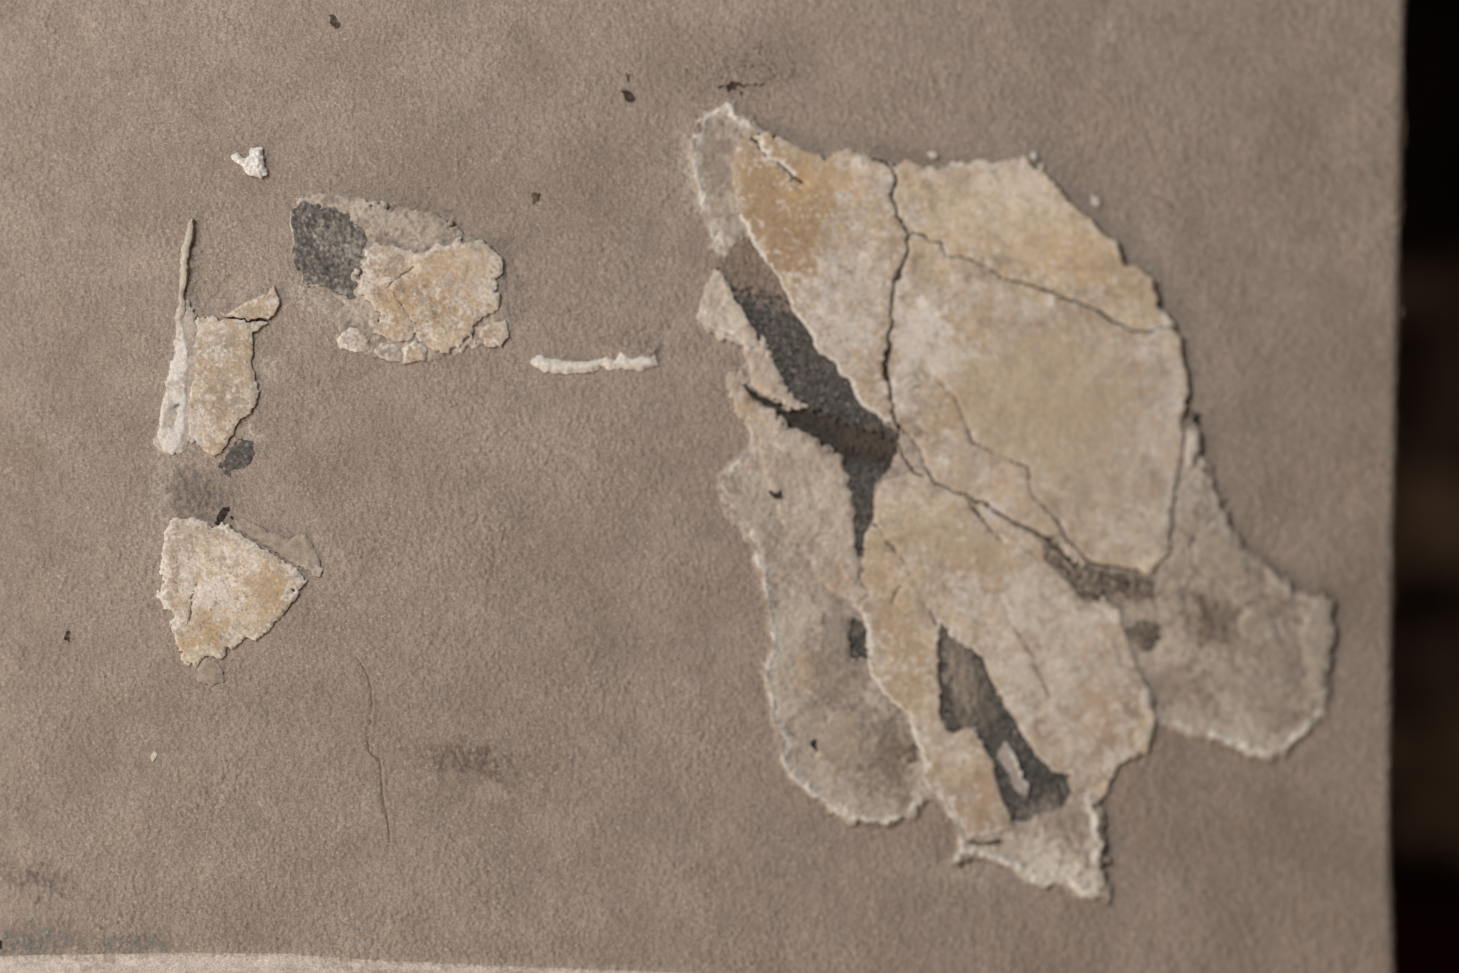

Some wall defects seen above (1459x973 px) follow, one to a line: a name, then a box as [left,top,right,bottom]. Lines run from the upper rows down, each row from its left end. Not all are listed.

crack [750,134,803,184]
flaking render [153,218,281,477]
flaking render [290,193,512,365]
crack [878,159,1202,578]
flaking render [156,507,324,686]
crack [872,523,937,626]
flaking render [686,98,1337,906]
crack [1013,626,1049,699]